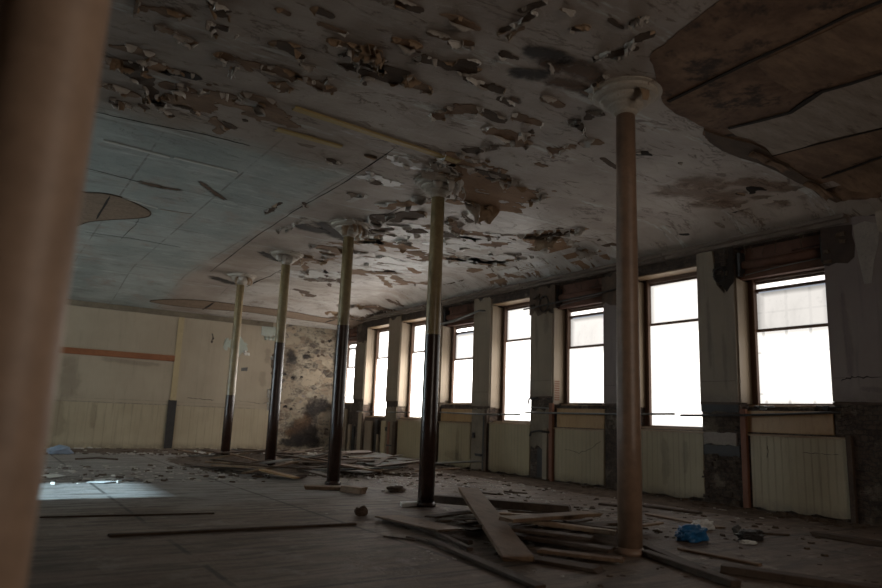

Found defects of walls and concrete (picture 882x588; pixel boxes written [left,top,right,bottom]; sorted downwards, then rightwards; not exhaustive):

peeling [204,0,239,40]
peeling [591,15,656,62]
peeling [99,40,337,135]
peeling [309,0,616,318]
peeling [267,192,431,297]
leakage [287,349,310,361]
leakage [280,398,331,447]